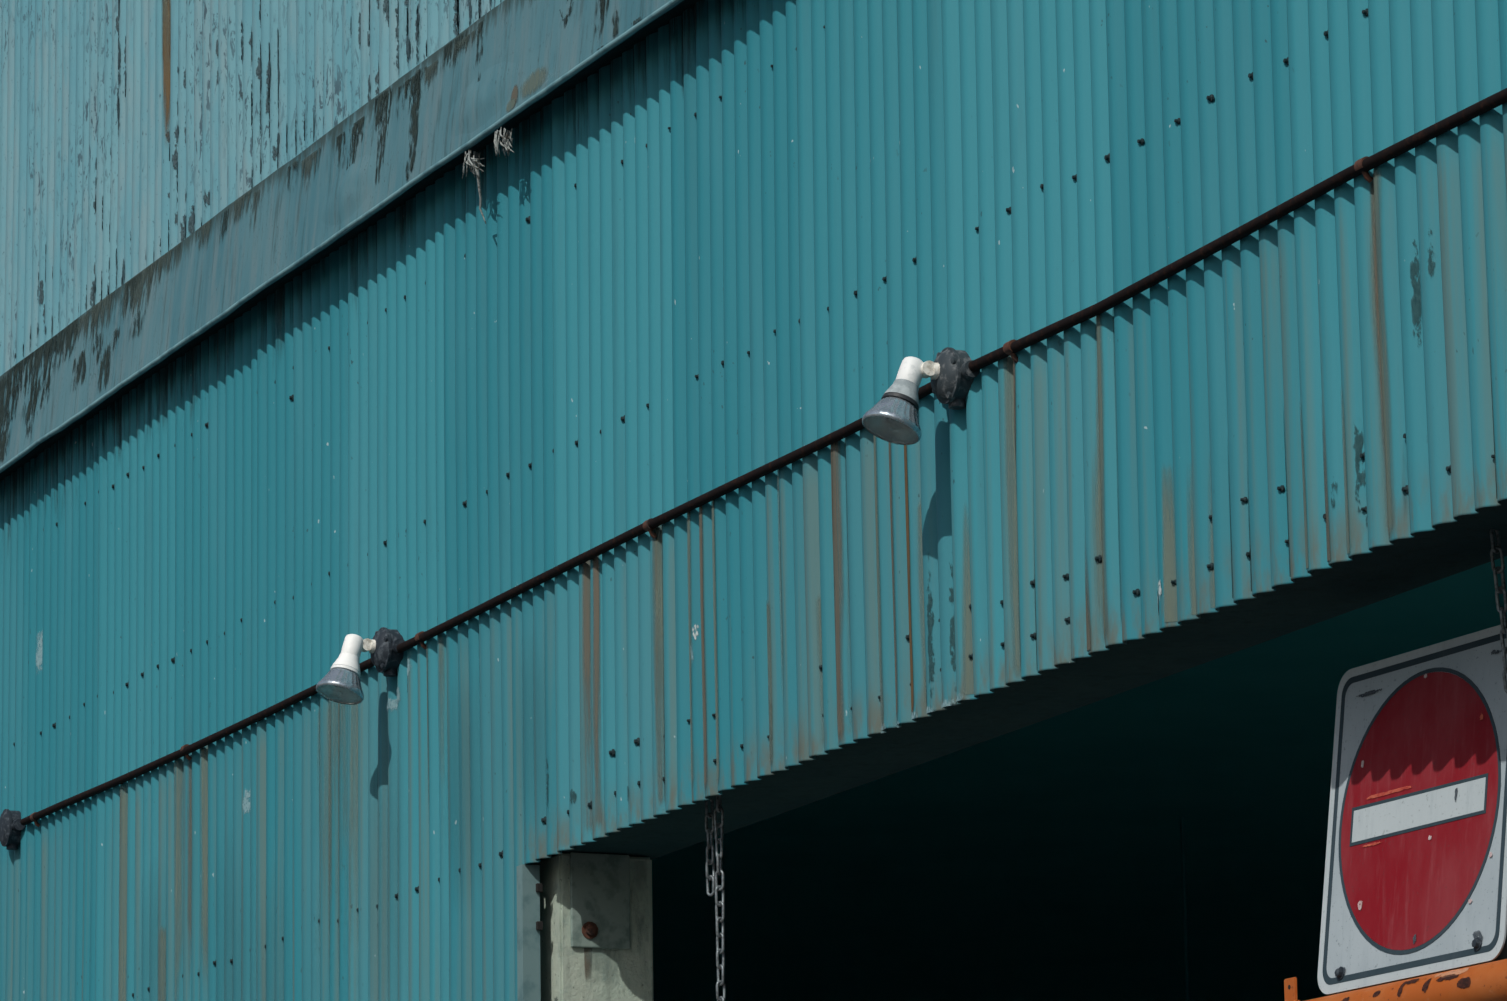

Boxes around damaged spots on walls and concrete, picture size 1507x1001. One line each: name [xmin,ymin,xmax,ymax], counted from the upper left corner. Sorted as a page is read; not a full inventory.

peeling [78,0,210,312]
peeling [239,0,314,189]
peeling [350,0,427,102]
peeling [453,0,501,36]
peeling [15,243,59,359]
corrosion [1372,170,1392,536]
corrosion [582,556,600,797]
corrosion [687,500,719,786]
corrosion [819,441,848,738]
corrosion [873,435,974,720]
corrosion [1005,356,1038,671]
corrosion [119,787,128,1001]